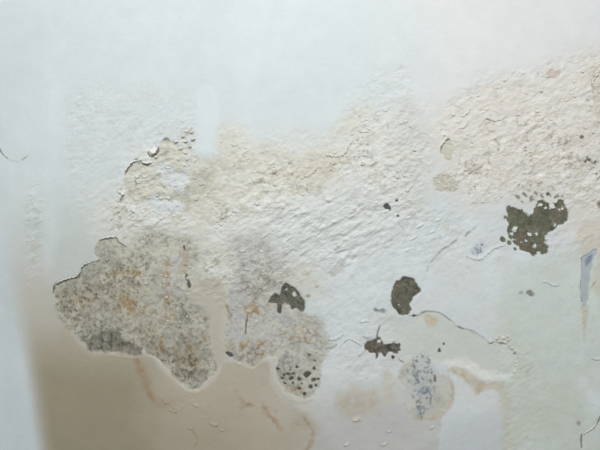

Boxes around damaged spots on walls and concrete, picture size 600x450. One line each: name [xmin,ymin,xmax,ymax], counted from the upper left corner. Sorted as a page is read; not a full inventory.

crack [0,148,30,163]
peeling [119,130,233,221]
damp [194,100,377,238]
peeling [426,54,600,257]
damp [514,179,565,205]
damp [583,156,600,180]
damp [85,325,144,357]
peeling [51,225,336,405]
peeling [358,276,519,422]
peeling [578,248,598,310]